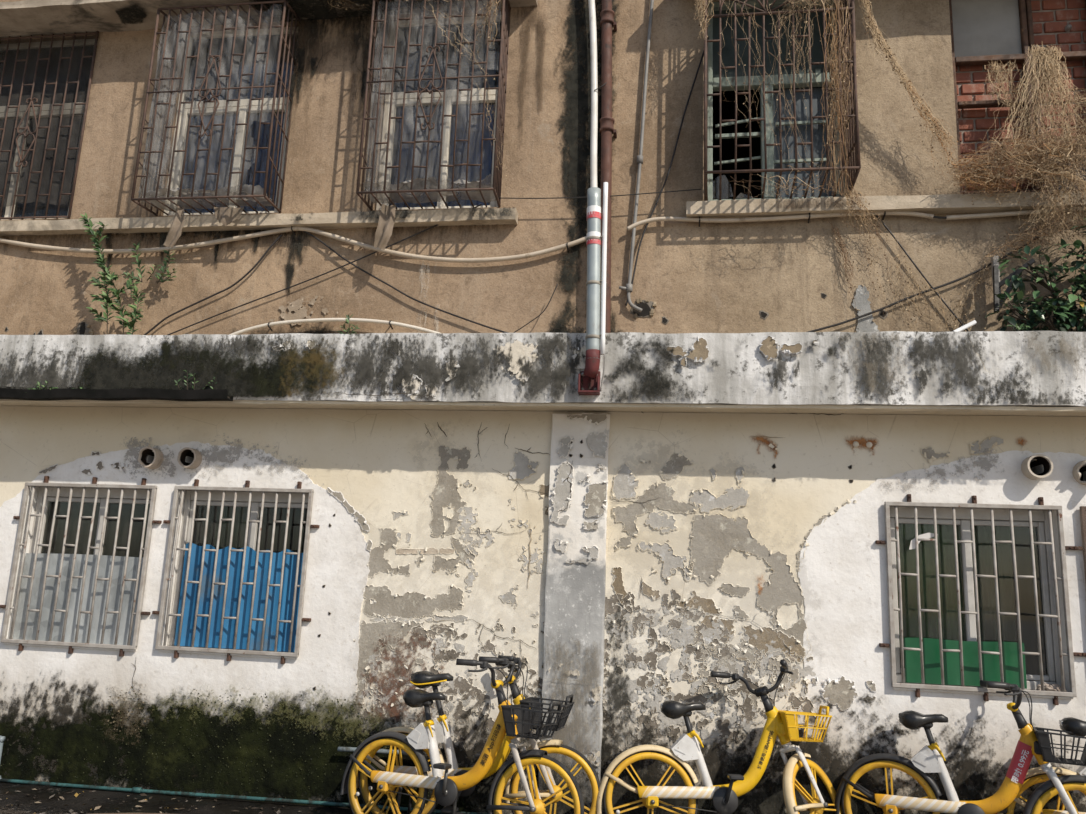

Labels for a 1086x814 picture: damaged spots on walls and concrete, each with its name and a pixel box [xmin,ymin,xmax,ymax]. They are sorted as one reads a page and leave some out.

leakage [0,0,599,400]
peeling [493,339,539,381]
peeling [666,337,710,367]
peeling [759,336,819,361]
leakage [811,331,1086,405]
corrosion [754,436,778,458]
corrosion [846,437,876,455]
peeling [327,445,580,756]
peeling [507,412,877,768]
leakage [0,677,107,781]
leakage [422,605,920,814]
leakage [851,717,1008,814]